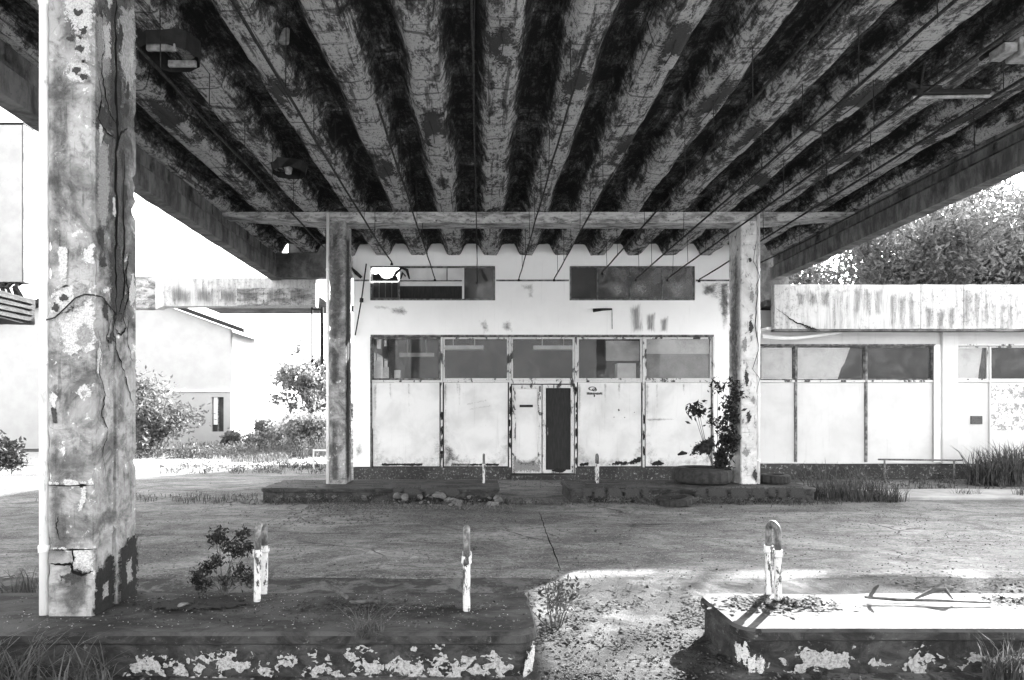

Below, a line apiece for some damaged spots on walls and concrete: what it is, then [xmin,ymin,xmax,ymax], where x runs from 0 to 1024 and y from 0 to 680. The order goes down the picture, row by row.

spalling [62,0,137,118]
spalling [81,123,128,269]
crack [93,0,134,475]
spalling [129,273,137,307]
peeling [47,247,115,374]
crack [780,311,820,332]
crack [539,513,561,571]
peeling [71,546,96,574]
peeling [122,644,535,678]
peeling [734,641,856,674]
peeling [868,644,1024,673]